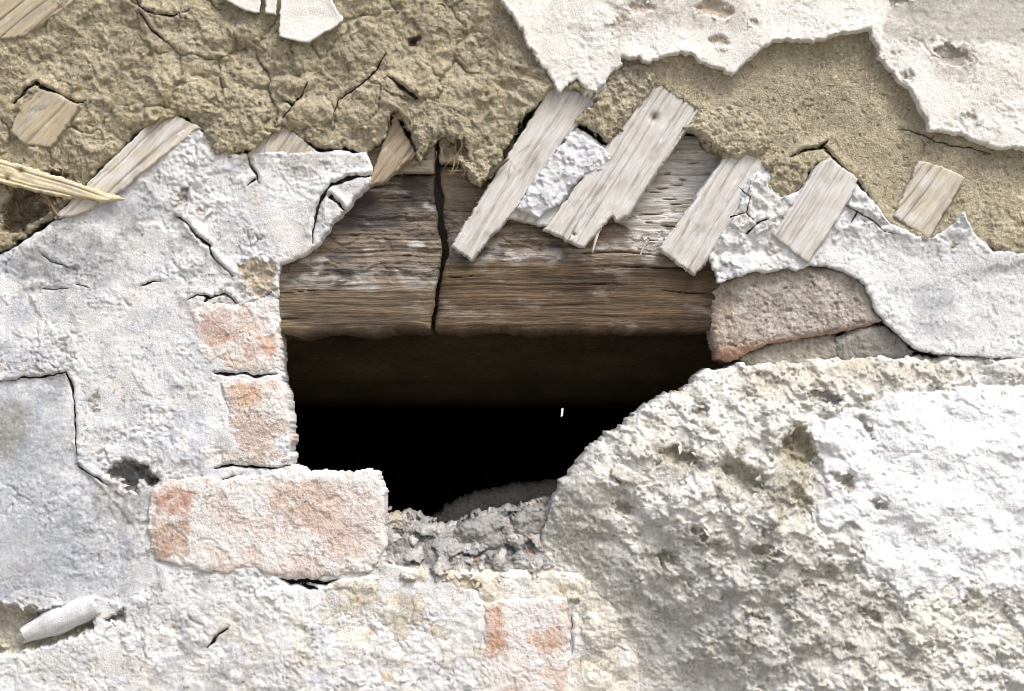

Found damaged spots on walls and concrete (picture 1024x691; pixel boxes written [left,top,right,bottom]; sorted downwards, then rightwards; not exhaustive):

flaking render [227,0,343,43]
crack [13,81,84,104]
crack [333,52,418,129]
flaking render [501,0,1024,152]
crack [792,141,847,170]
crack [312,175,370,244]
crack [177,216,237,304]
crack [0,372,107,485]
spalling [103,459,159,498]
peeling [609,463,649,486]
spalling [657,444,703,466]
spalling [612,499,635,516]